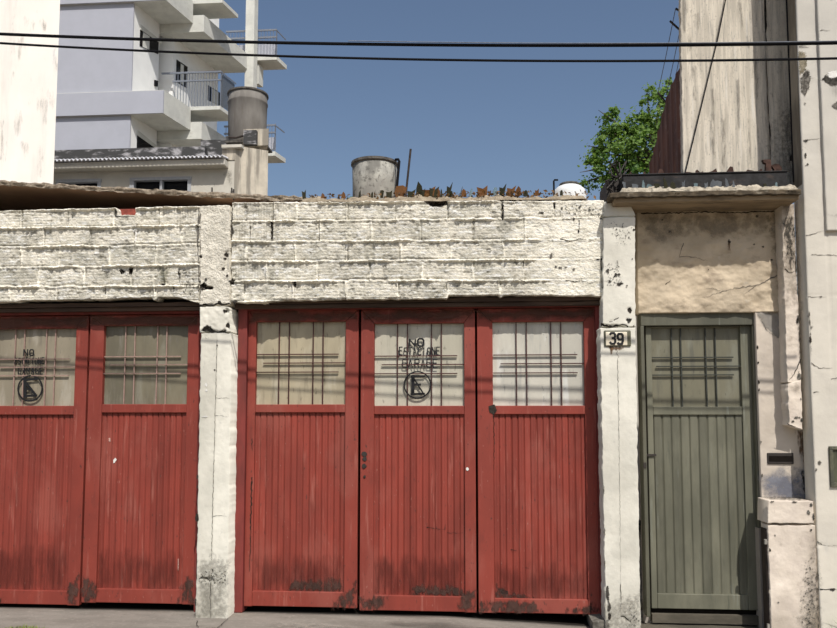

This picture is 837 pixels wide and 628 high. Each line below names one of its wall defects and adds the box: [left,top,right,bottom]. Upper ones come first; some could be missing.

peeling [798,51,811,103]
peeling [822,71,837,86]
leakage [766,470,806,499]